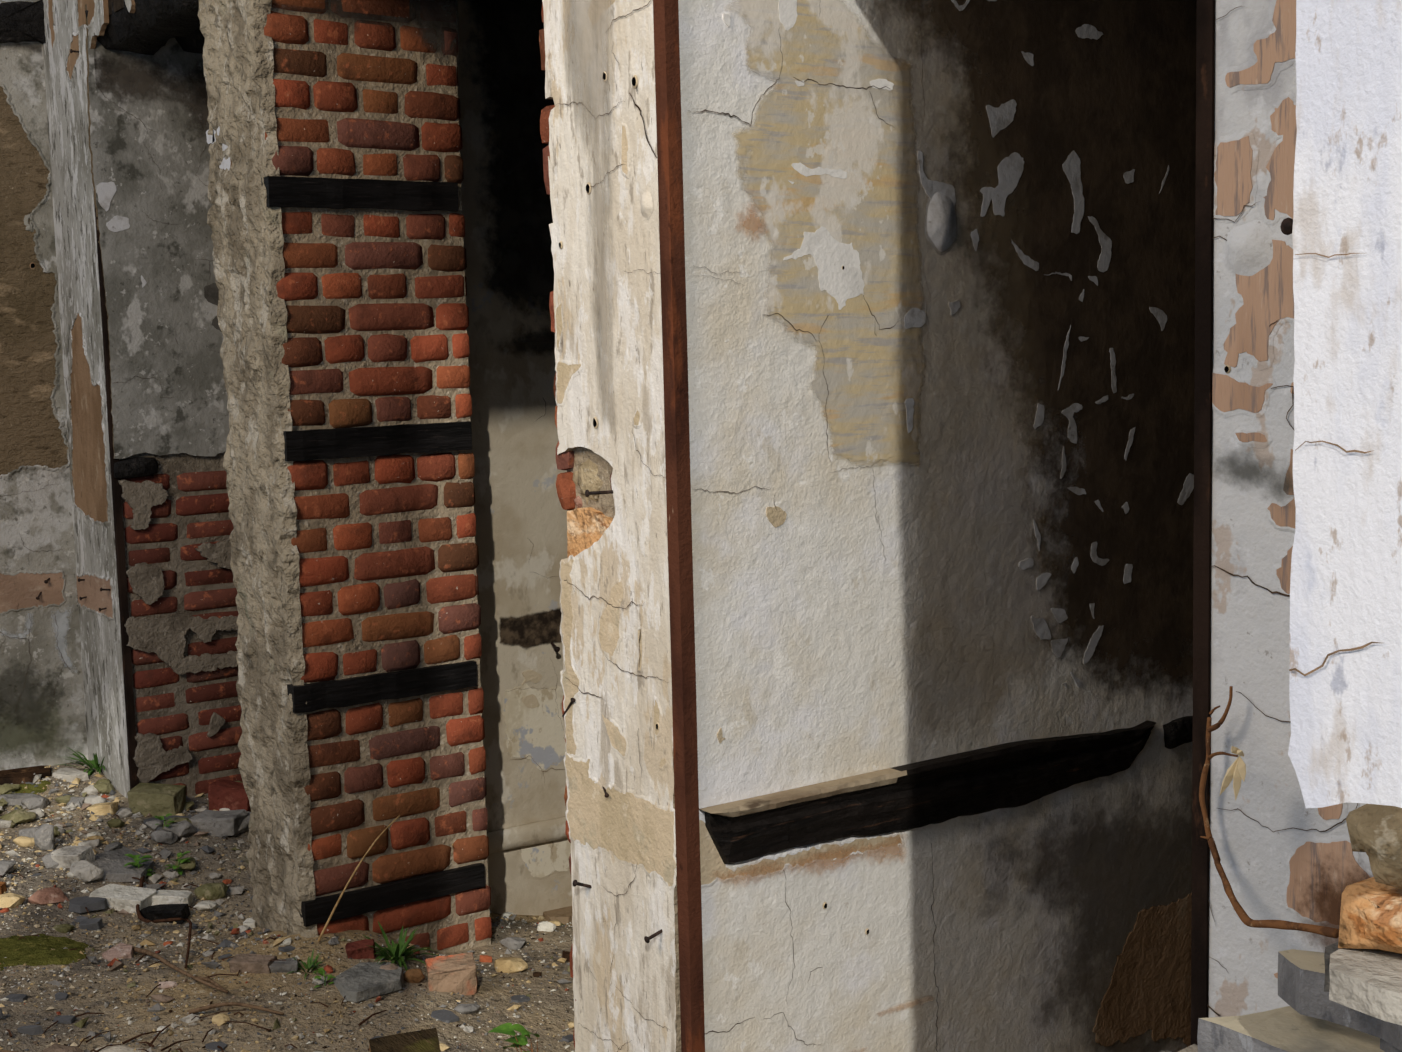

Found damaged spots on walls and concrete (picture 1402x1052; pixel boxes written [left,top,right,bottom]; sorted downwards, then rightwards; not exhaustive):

spalling [540,105,555,195]
crack [555,0,657,187]
peeling [722,0,956,465]
peeling [1212,0,1297,448]
spalling [0,83,243,796]
crack [1210,565,1290,597]
peeling [1264,444,1296,606]
damp [0,667,54,727]
crack [1236,691,1291,723]
crack [1289,642,1380,676]
crack [1218,803,1358,832]
peeling [1282,802,1374,926]